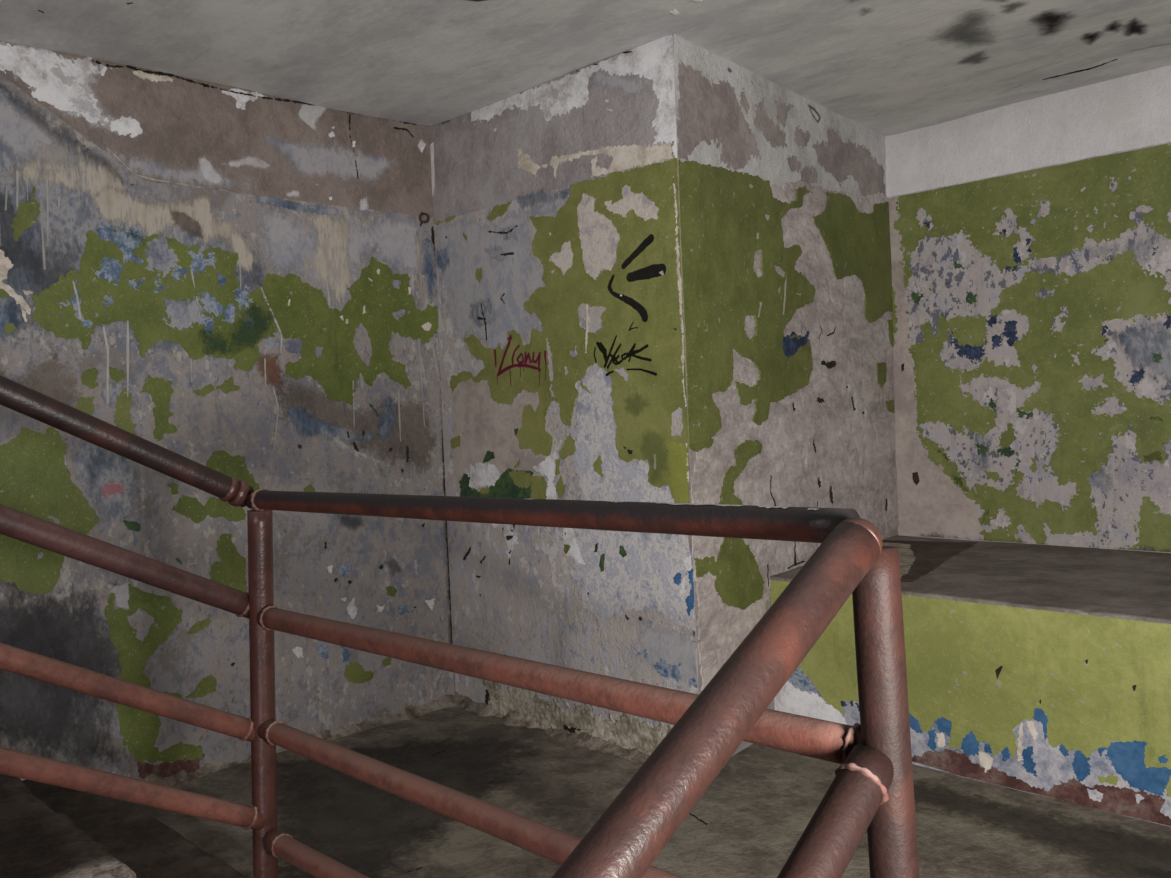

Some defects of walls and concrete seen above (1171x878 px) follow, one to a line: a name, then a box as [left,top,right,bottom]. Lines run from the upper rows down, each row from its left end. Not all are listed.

leakage [0,85,422,337]
peeling [0,60,1171,552]
leakage [12,356,75,405]
leakage [280,381,433,470]
peeling [0,534,64,595]
peeling [104,582,212,688]
peeling [116,703,205,779]
peeling [167,482,247,592]
peeling [491,523,518,565]
peeling [562,528,821,690]
peeling [774,594,859,725]
peeling [902,594,1171,802]